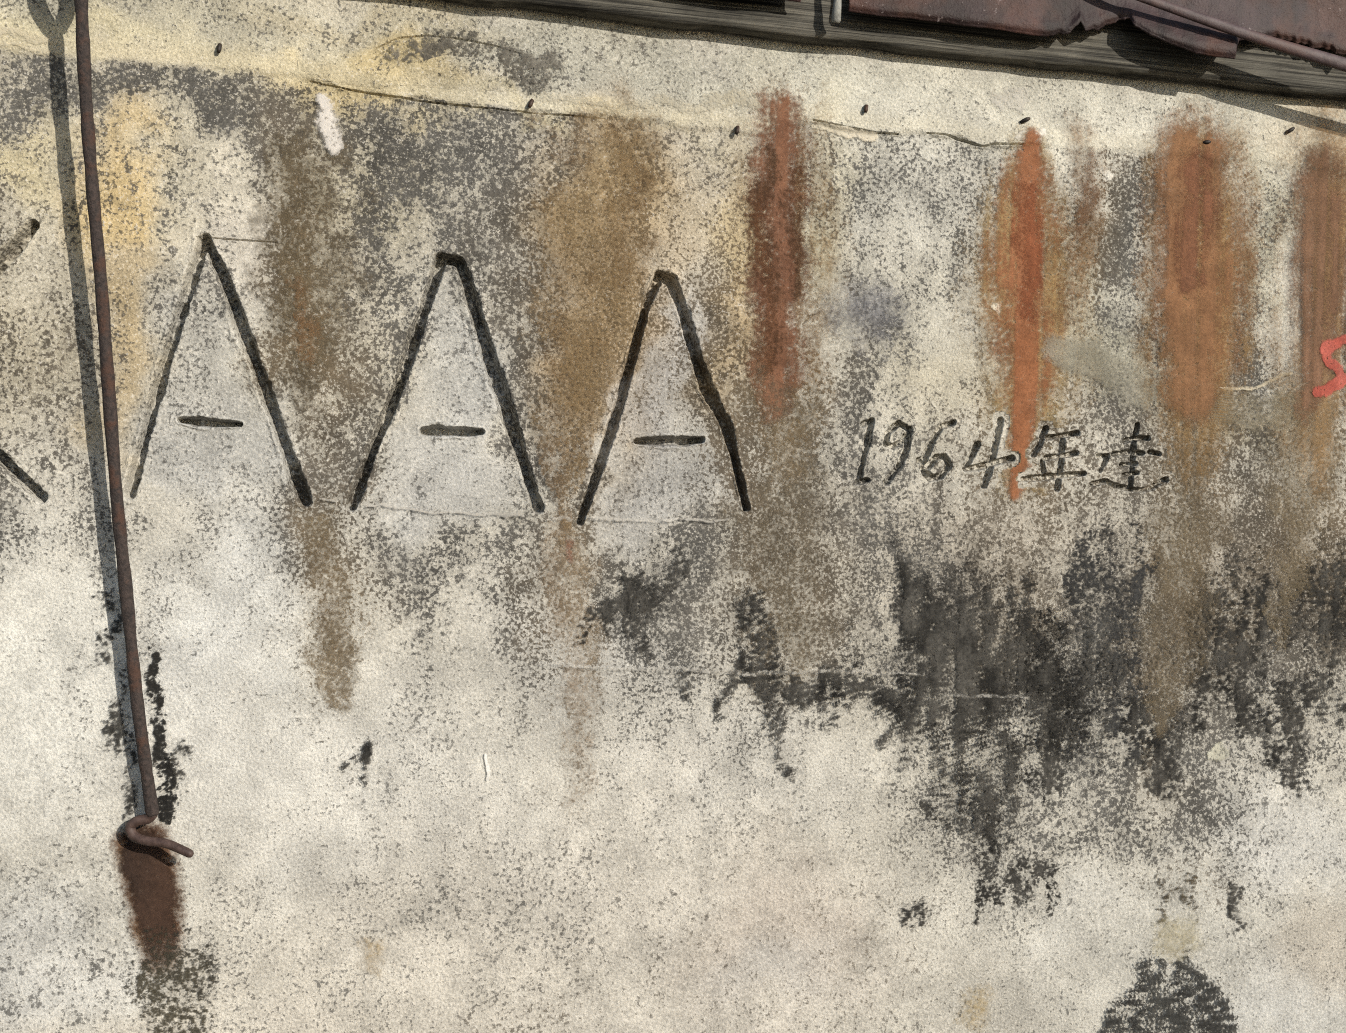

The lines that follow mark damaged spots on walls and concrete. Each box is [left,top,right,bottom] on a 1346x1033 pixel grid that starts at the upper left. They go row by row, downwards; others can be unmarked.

corrosion [746,94,826,422]
corrosion [979,129,1101,499]
corrosion [1143,118,1257,470]
corrosion [1291,110,1346,487]
mould [674,664,694,703]
mould [712,517,1346,932]
corrosion [114,823,227,1033]
mould [1099,949,1239,1033]